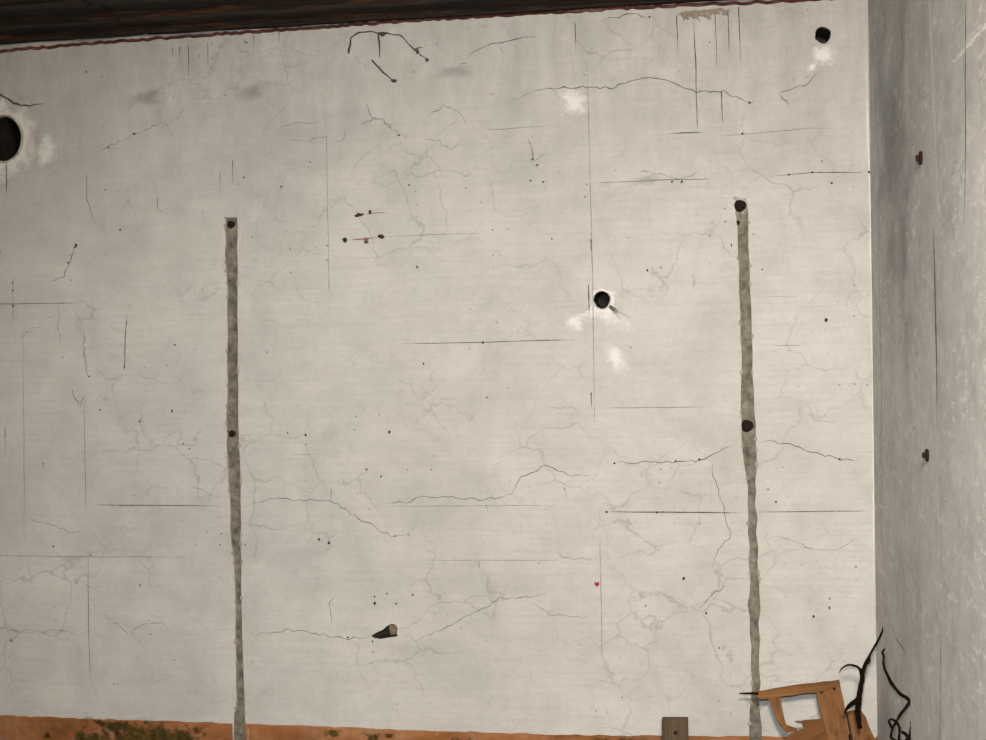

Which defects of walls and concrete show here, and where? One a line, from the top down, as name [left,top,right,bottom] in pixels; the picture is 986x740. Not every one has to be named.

crack [533,77,751,122]
crack [779,148,878,184]
crack [590,171,701,287]
crack [12,247,101,441]
crack [413,338,553,346]
crack [775,441,853,461]
crack [119,487,207,506]
crack [250,498,404,537]
crack [396,465,586,511]
crack [605,447,731,564]
crack [420,554,602,639]
crack [268,599,362,640]